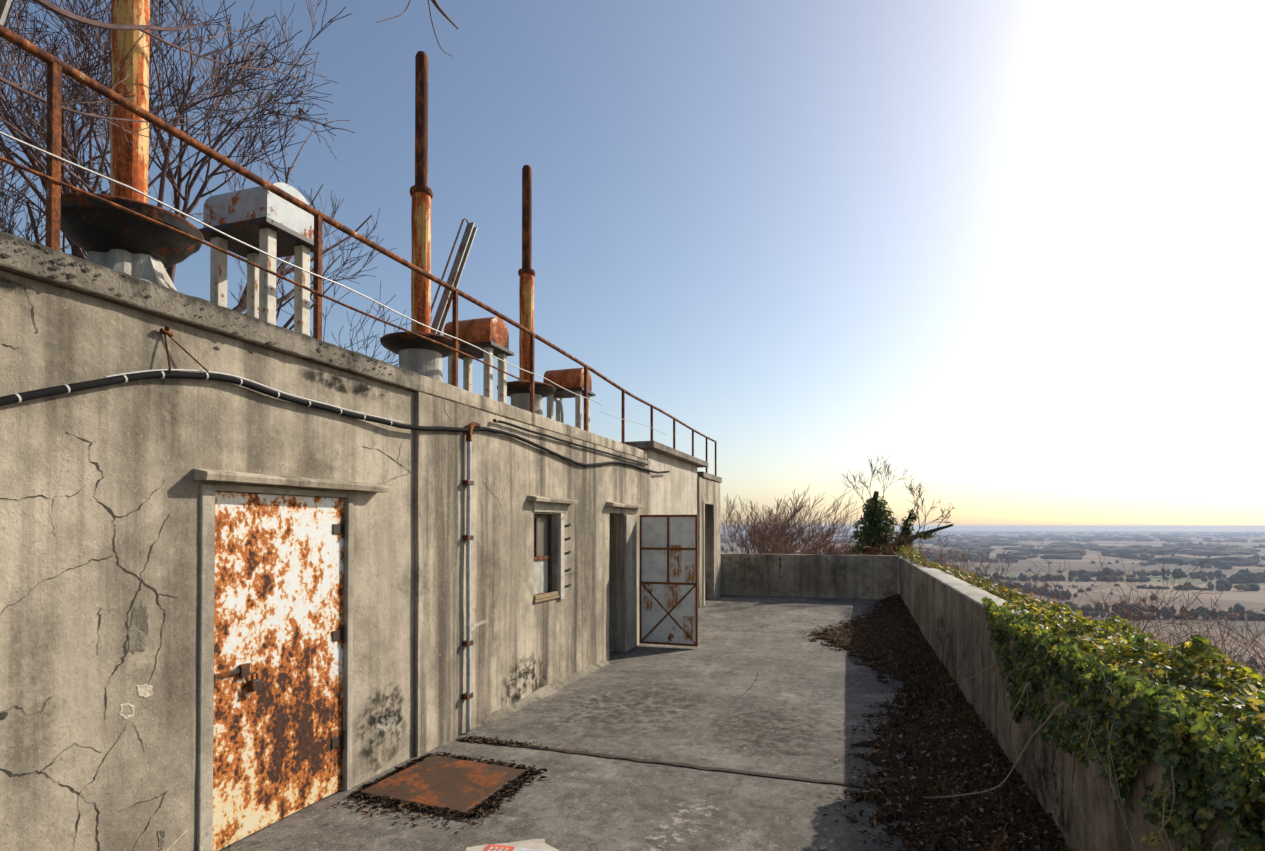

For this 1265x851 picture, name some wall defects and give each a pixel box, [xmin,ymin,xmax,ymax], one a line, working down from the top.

rust [644,545,695,609]
crack [0,432,177,851]
water stain [505,657,544,704]
water stain [362,688,403,763]